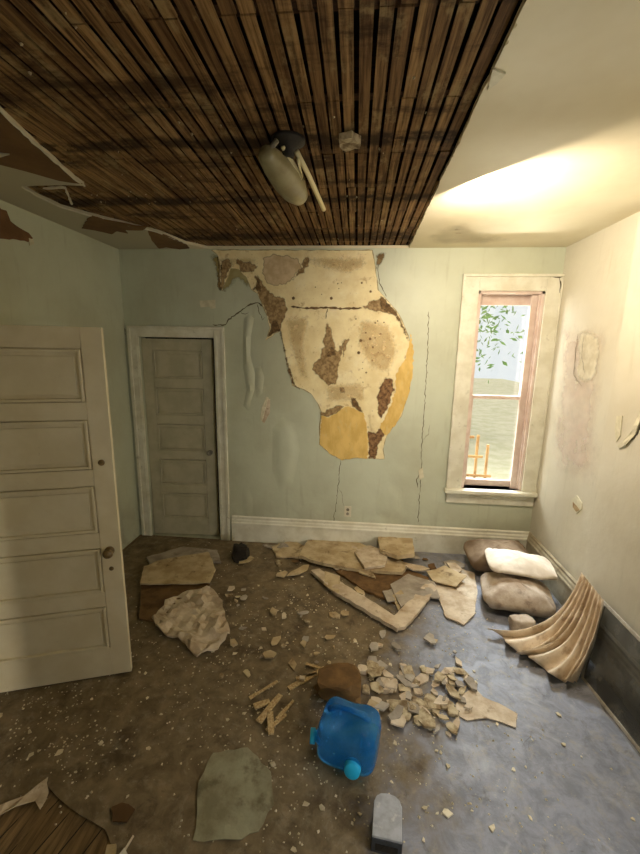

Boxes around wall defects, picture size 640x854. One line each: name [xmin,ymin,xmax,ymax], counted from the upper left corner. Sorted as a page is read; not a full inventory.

crack [214,302,263,326]
flaking render [0,0,526,460]
crack [416,312,430,522]
peeling [615,412,640,449]